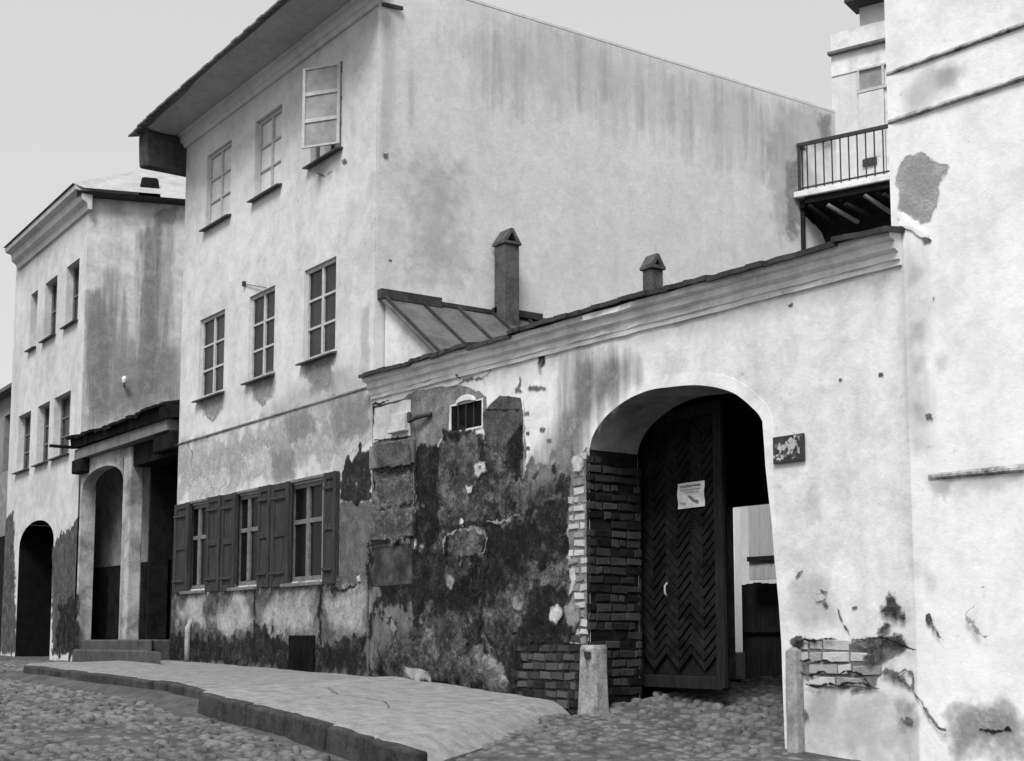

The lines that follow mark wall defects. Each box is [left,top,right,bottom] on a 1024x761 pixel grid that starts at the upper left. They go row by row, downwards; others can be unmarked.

peeling [895,152,948,243]
leakage [89,209,178,423]
leakage [504,358,627,492]
leakage [0,510,16,655]
leakage [51,518,81,661]
leakage [169,573,368,676]
peeling [332,427,643,716]
spalling [790,593,916,690]
crack [850,668,946,731]